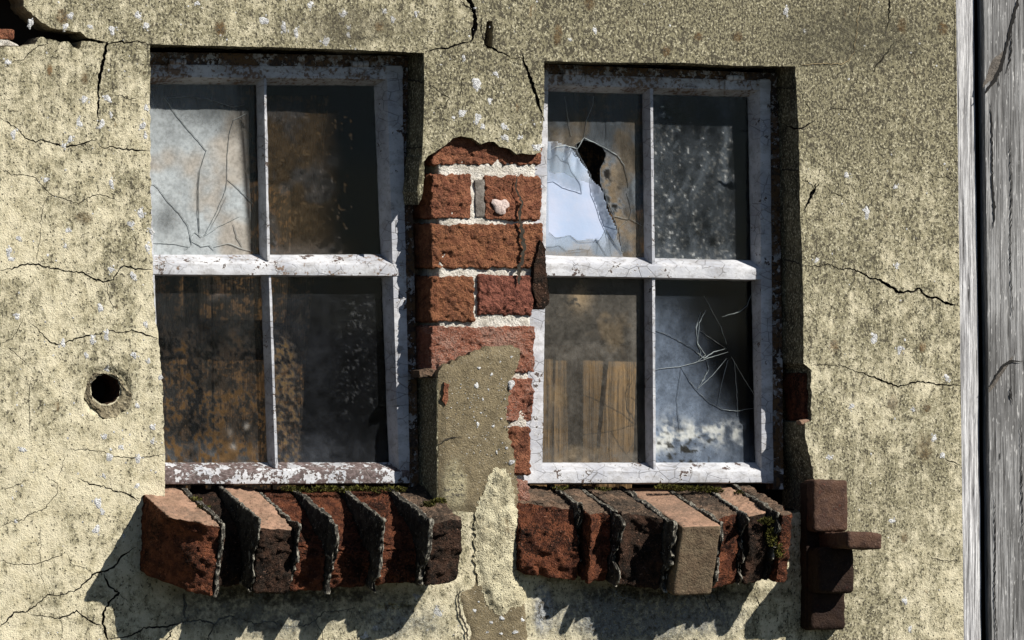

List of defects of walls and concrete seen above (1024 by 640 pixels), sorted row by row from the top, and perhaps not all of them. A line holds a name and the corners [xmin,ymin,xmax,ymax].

crack [0,0,150,154]
crack [425,0,545,121]
crack [0,168,156,431]
flaking render [402,137,549,615]
crack [784,259,959,306]
crack [810,364,960,388]
crack [0,449,353,640]